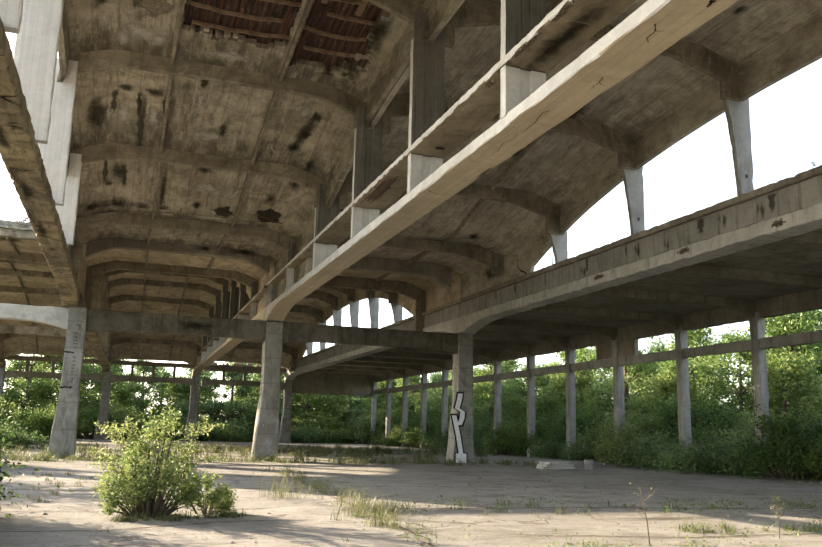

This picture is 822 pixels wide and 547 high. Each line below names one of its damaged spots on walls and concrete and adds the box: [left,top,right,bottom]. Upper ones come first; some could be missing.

leakage [90,85,166,143]
leakage [288,105,321,151]
leakage [103,160,127,185]
spalling [209,206,234,217]
spalling [253,208,282,224]